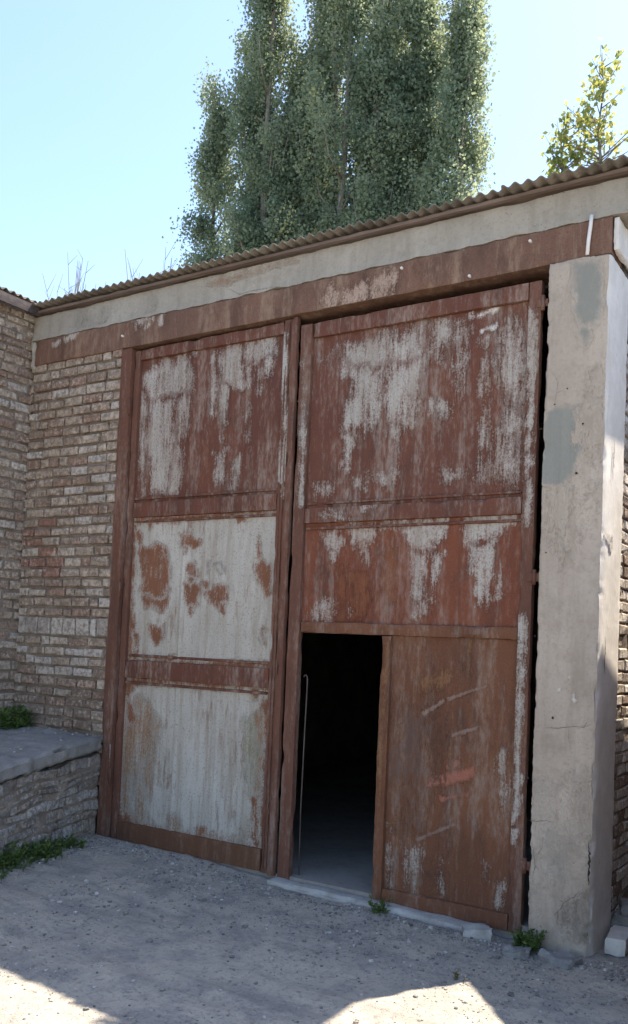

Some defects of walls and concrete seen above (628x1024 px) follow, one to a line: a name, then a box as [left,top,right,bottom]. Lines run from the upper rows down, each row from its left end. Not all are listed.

peeling [137,306,540,622]
damp [544,363,606,572]
rust [128,510,276,668]
rust [119,677,268,849]
rust [376,641,390,806]